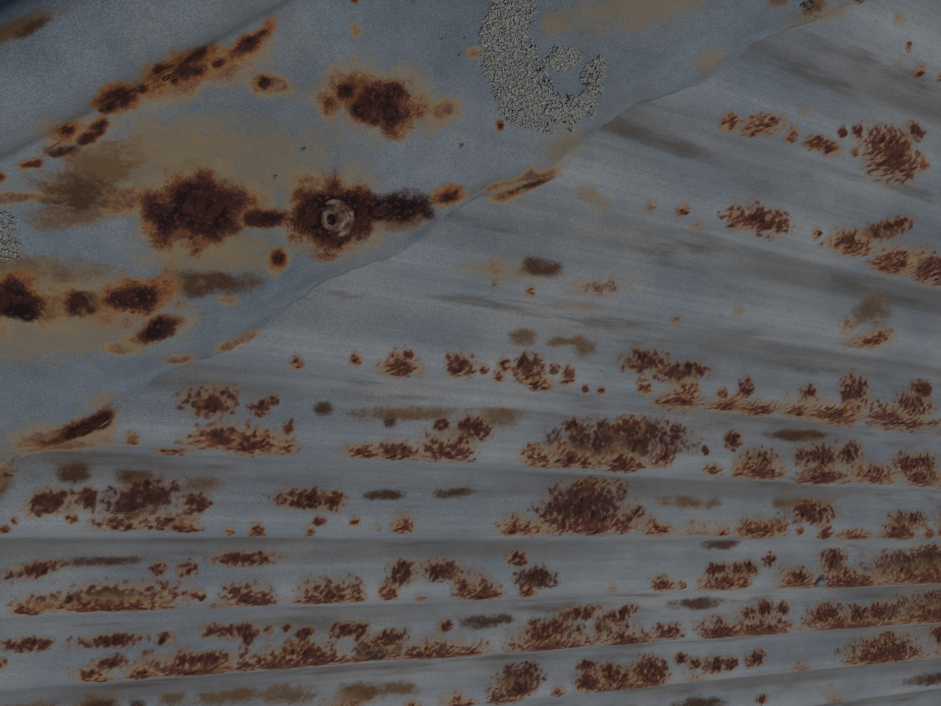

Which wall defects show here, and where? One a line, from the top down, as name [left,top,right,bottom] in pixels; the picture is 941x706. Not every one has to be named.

rust [719,111,930,184]
rust [0,17,467,355]
rust [813,216,941,287]
rust [0,406,139,494]
rust [157,386,301,458]
rust [345,409,515,463]
rust [29,463,217,533]
rust [268,486,348,536]
rust [437,349,941,706]
rust [4,557,277,617]
rust [378,557,506,601]
rust [67,614,512,683]